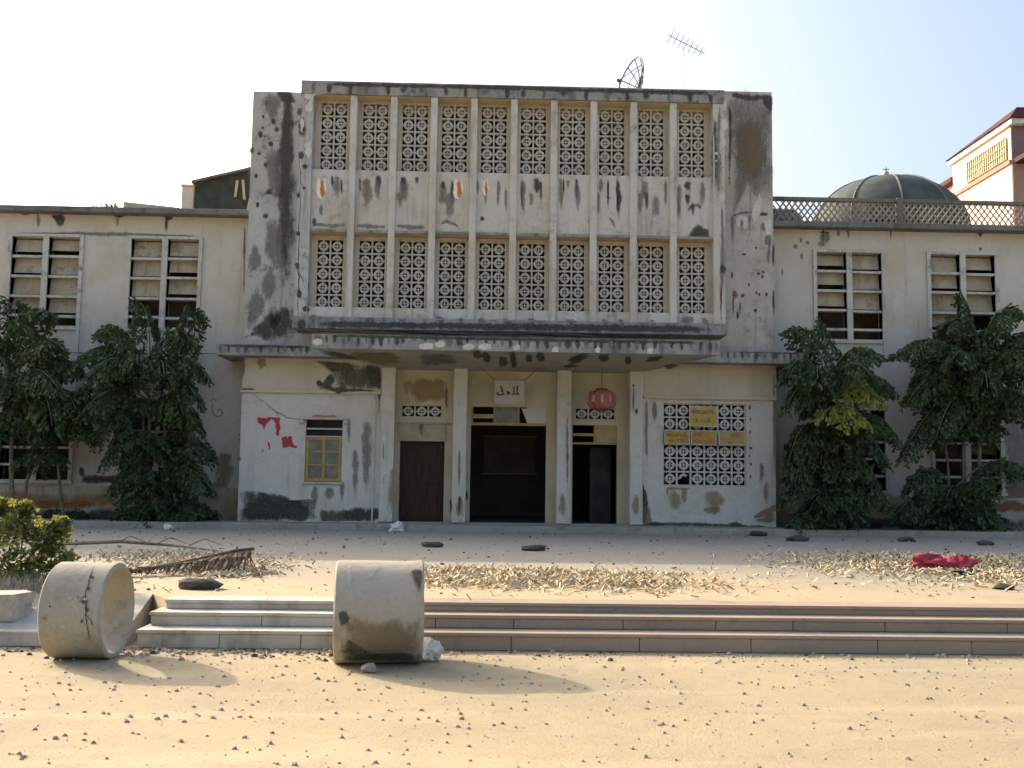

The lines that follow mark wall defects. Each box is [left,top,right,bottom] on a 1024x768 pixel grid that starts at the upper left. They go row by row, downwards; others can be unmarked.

water stain [219,90,805,399]
water stain [408,379,448,406]
peeling [257,417,297,452]
water stain [240,422,386,522]
crack [79,566,95,640]